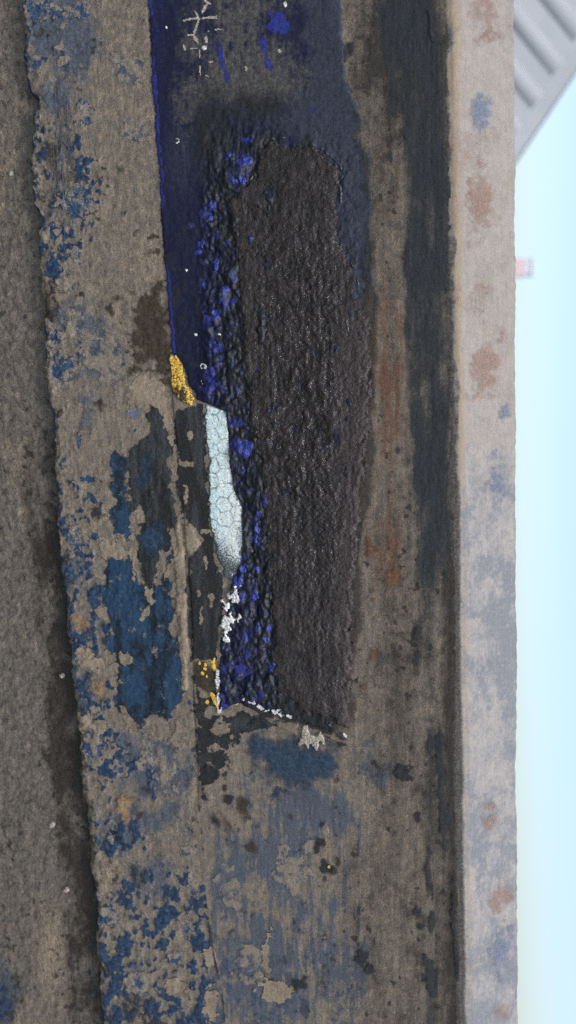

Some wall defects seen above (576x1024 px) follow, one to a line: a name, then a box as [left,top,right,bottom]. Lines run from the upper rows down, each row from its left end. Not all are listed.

peeling [23,0,97,68]
peeling [31,122,207,446]
peeling [170,459,194,504]
peeling [67,524,156,622]
peeling [76,645,133,674]
peeling [77,701,185,795]
peeling [271,839,317,896]
peeling [97,907,130,929]
peeling [123,919,195,996]
peeling [201,981,220,1023]
peeling [230,927,295,1004]
damp [423,955,439,998]